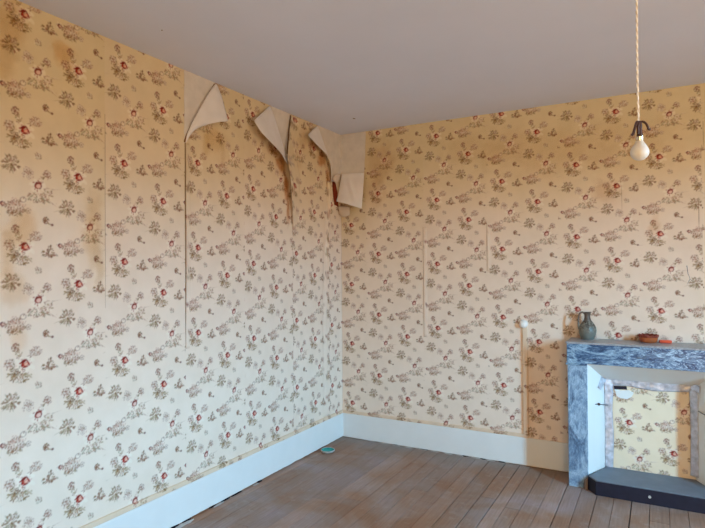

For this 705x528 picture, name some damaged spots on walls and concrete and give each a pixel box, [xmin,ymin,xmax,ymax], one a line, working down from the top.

flaking render [184,70,215,144]
flaking render [317,125,366,182]